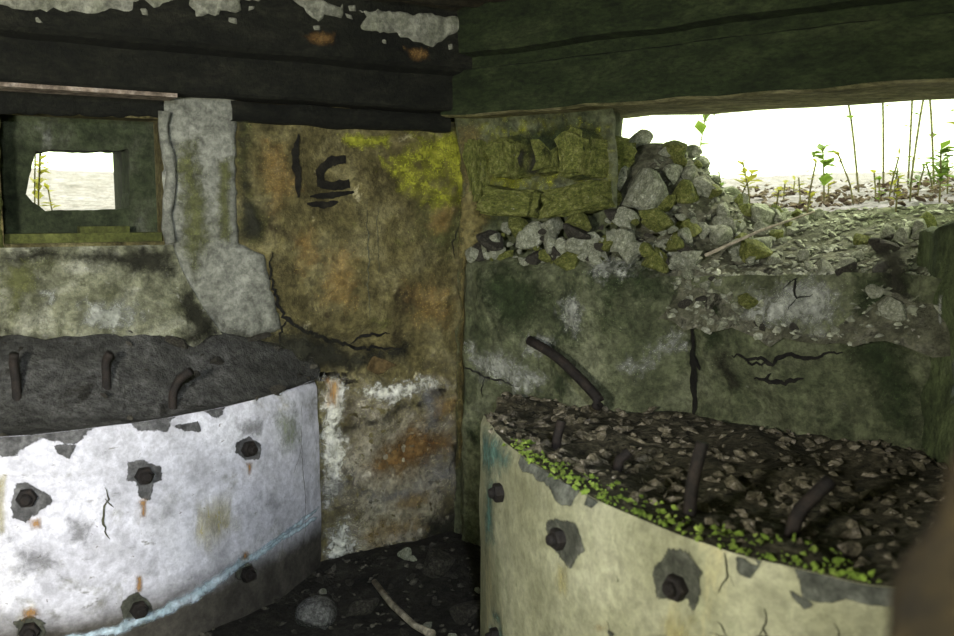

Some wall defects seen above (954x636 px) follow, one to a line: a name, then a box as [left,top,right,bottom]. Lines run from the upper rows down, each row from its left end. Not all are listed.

peeling [0,0,171,23]
peeling [189,0,260,24]
peeling [293,0,459,50]
crack [269,206,403,351]
spalling [742,279,839,333]
crack [732,351,843,386]
spalling [128,405,232,432]
spalling [0,427,97,459]
spalling [235,436,262,471]
crack [718,553,734,592]